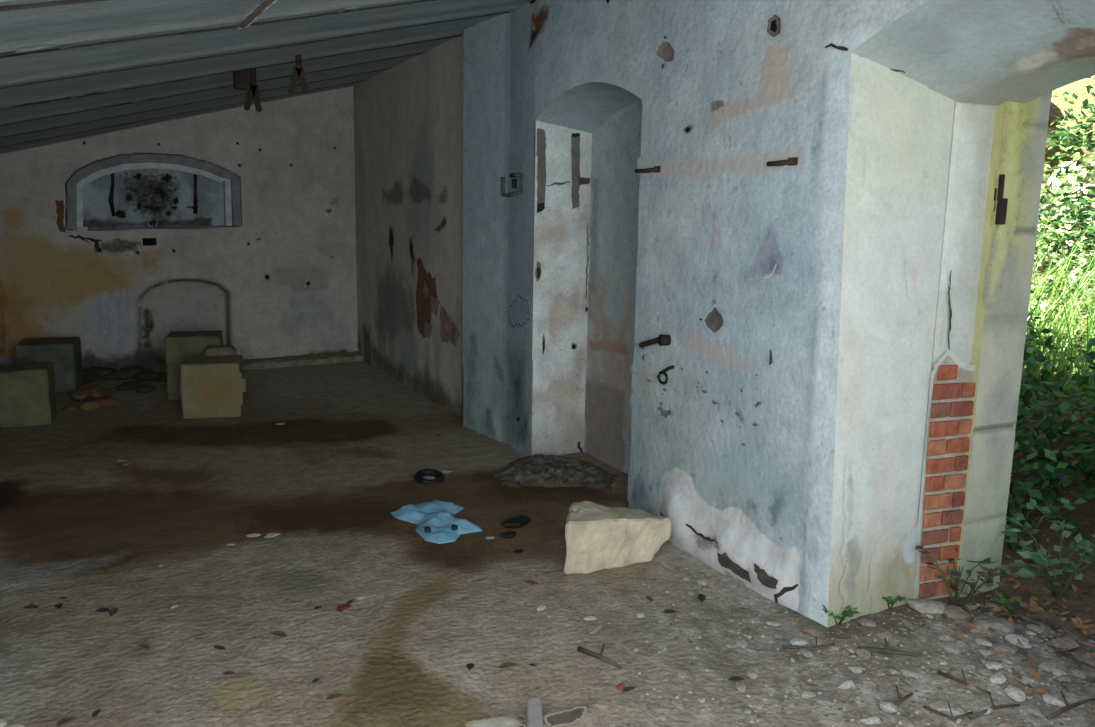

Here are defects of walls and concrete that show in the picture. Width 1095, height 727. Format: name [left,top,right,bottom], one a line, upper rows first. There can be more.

flaking render [1009,22,1095,75]
peeling [414,254,462,351]
crack [946,270,954,350]
water stain [0,173,653,727]
flaking render [899,350,976,600]